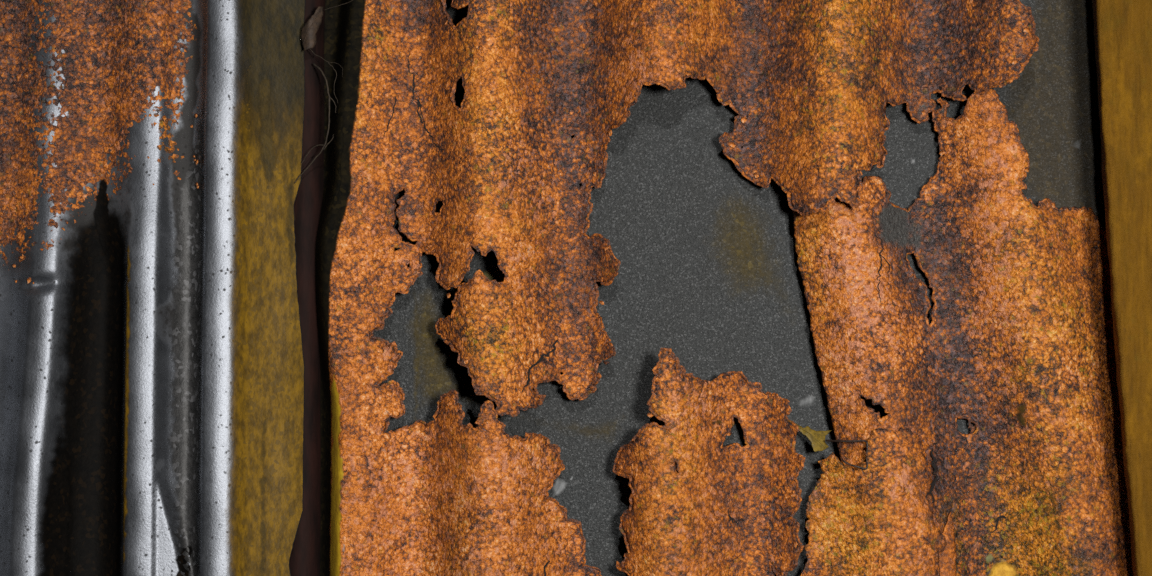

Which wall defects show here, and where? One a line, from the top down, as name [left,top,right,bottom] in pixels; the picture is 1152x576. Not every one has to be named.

corrosion [0,0,206,284]